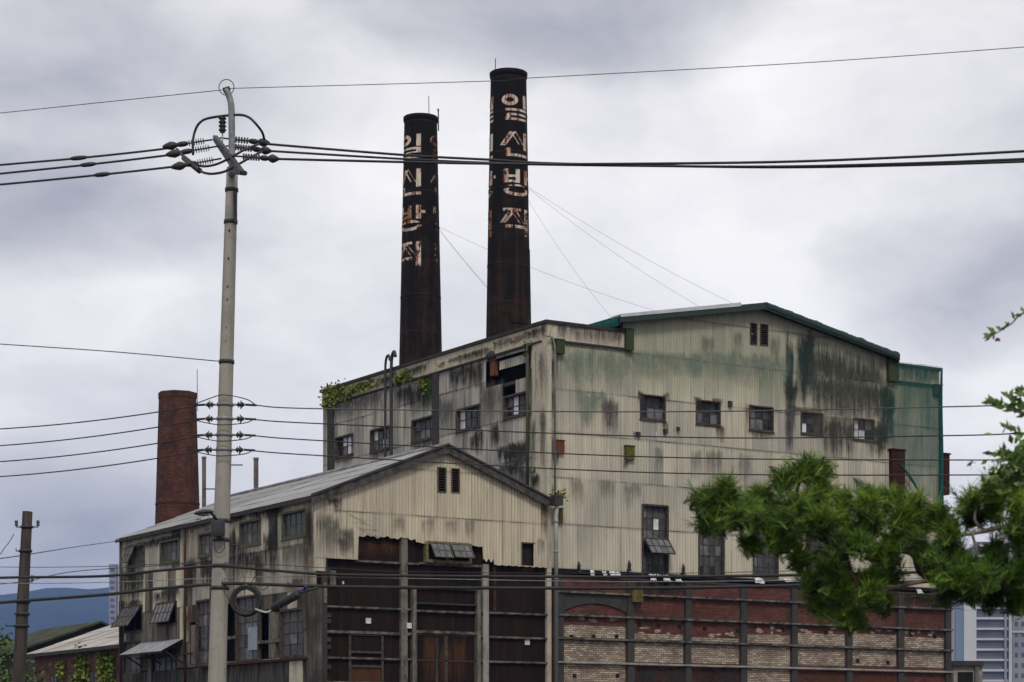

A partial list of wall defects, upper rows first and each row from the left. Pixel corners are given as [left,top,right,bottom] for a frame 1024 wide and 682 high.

leakage [525,325,895,452]
leakage [470,393,558,488]
peeling [564,617,944,682]